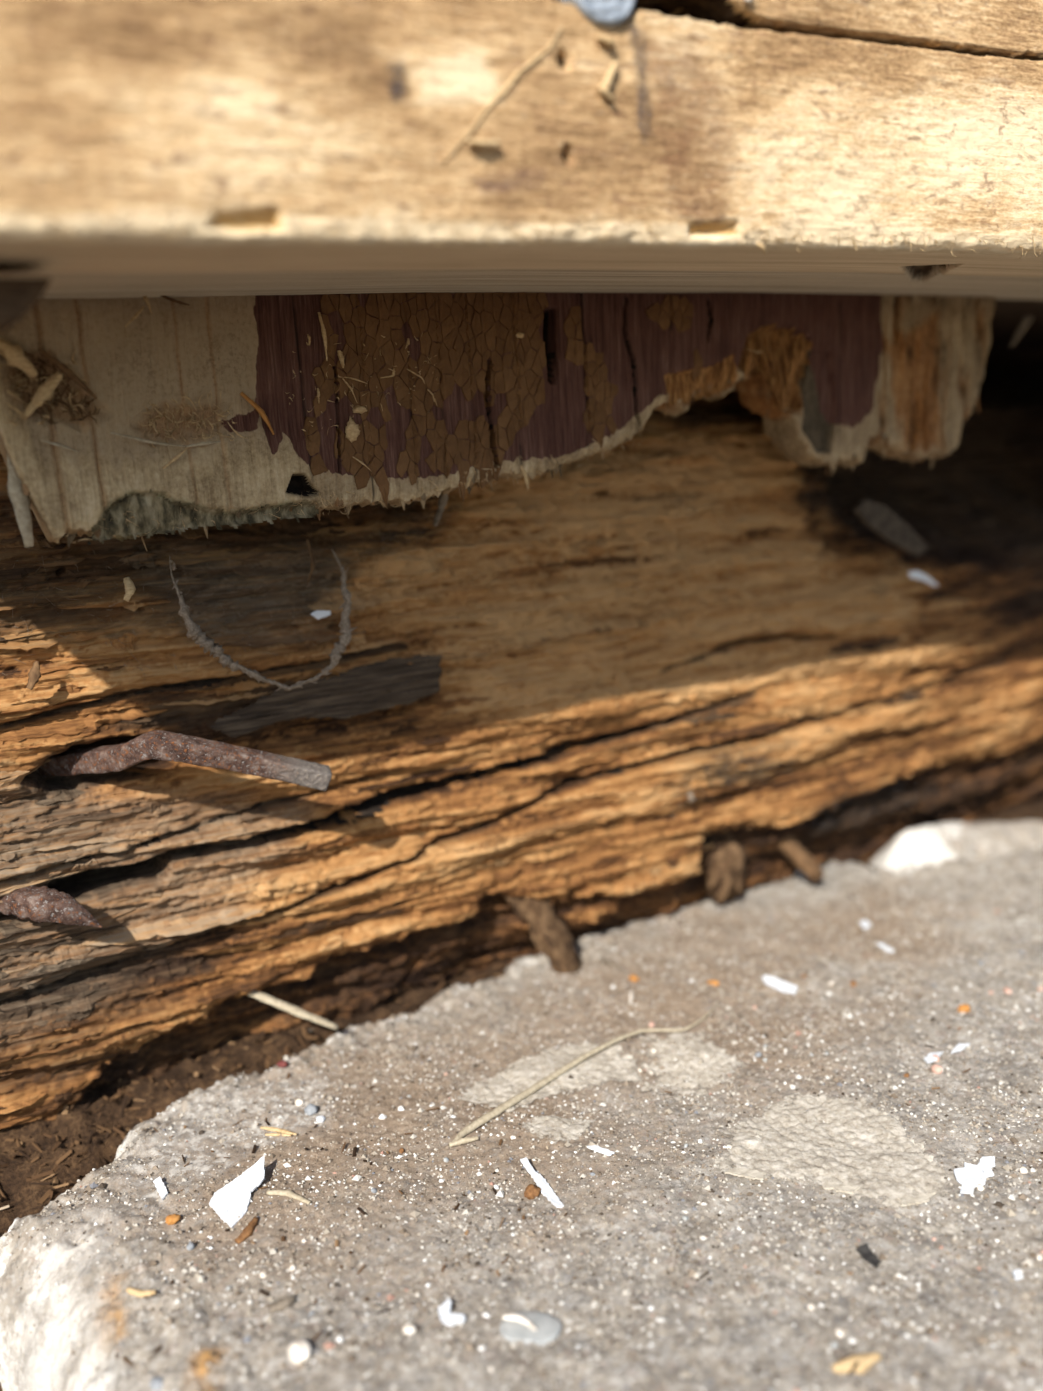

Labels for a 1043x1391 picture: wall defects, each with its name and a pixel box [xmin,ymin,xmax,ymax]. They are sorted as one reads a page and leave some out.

crack [632,0,764,30]
spalling [906,264,949,279]
spalling [664,323,813,414]
peeling [303,292,549,507]
crack [71,652,357,706]
crack [686,722,795,749]
crack [130,731,649,849]